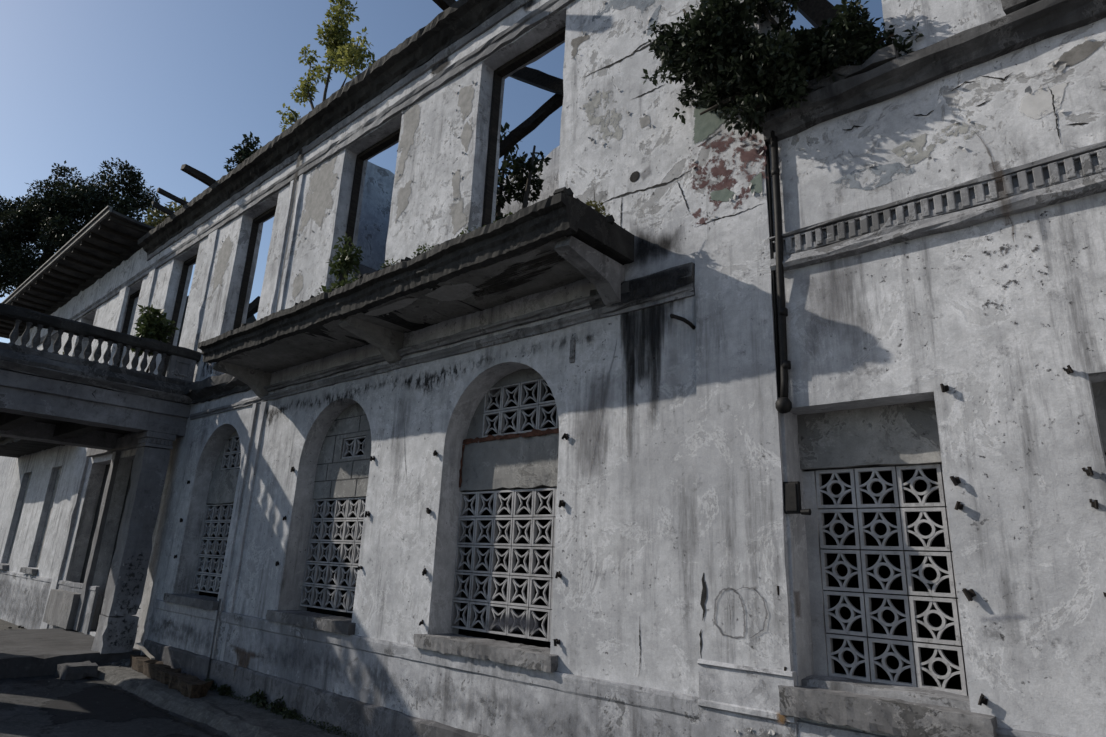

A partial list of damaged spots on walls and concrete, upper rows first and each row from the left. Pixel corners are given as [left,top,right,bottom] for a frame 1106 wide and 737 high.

peeling [571,0,661,59]
crack [585,42,653,77]
peeling [580,88,652,147]
crack [1048,86,1088,143]
peeling [689,103,769,225]
peeling [834,119,986,190]
peeling [297,152,339,248]
crack [603,170,764,227]
leakage [634,233,674,262]
leakage [612,266,688,411]
leakage [266,386,367,424]
leakage [405,363,474,392]